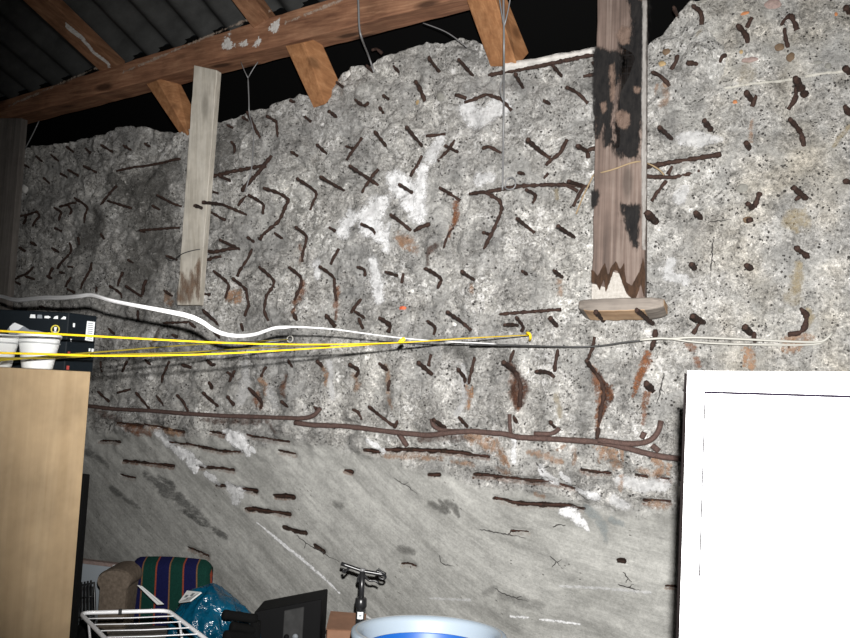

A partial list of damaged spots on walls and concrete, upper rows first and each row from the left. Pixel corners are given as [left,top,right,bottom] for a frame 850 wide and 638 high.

spalling [439,137,595,250]
spalling [644,151,722,225]
spalling [207,187,290,332]
peeling [592,272,631,299]
spalling [88,337,682,462]
corrosion [508,362,528,410]
corrosion [592,365,614,427]
corrosion [632,350,652,425]
damp [154,427,246,505]
damp [222,428,256,457]
corrosion [465,434,510,467]
damp [559,507,590,531]